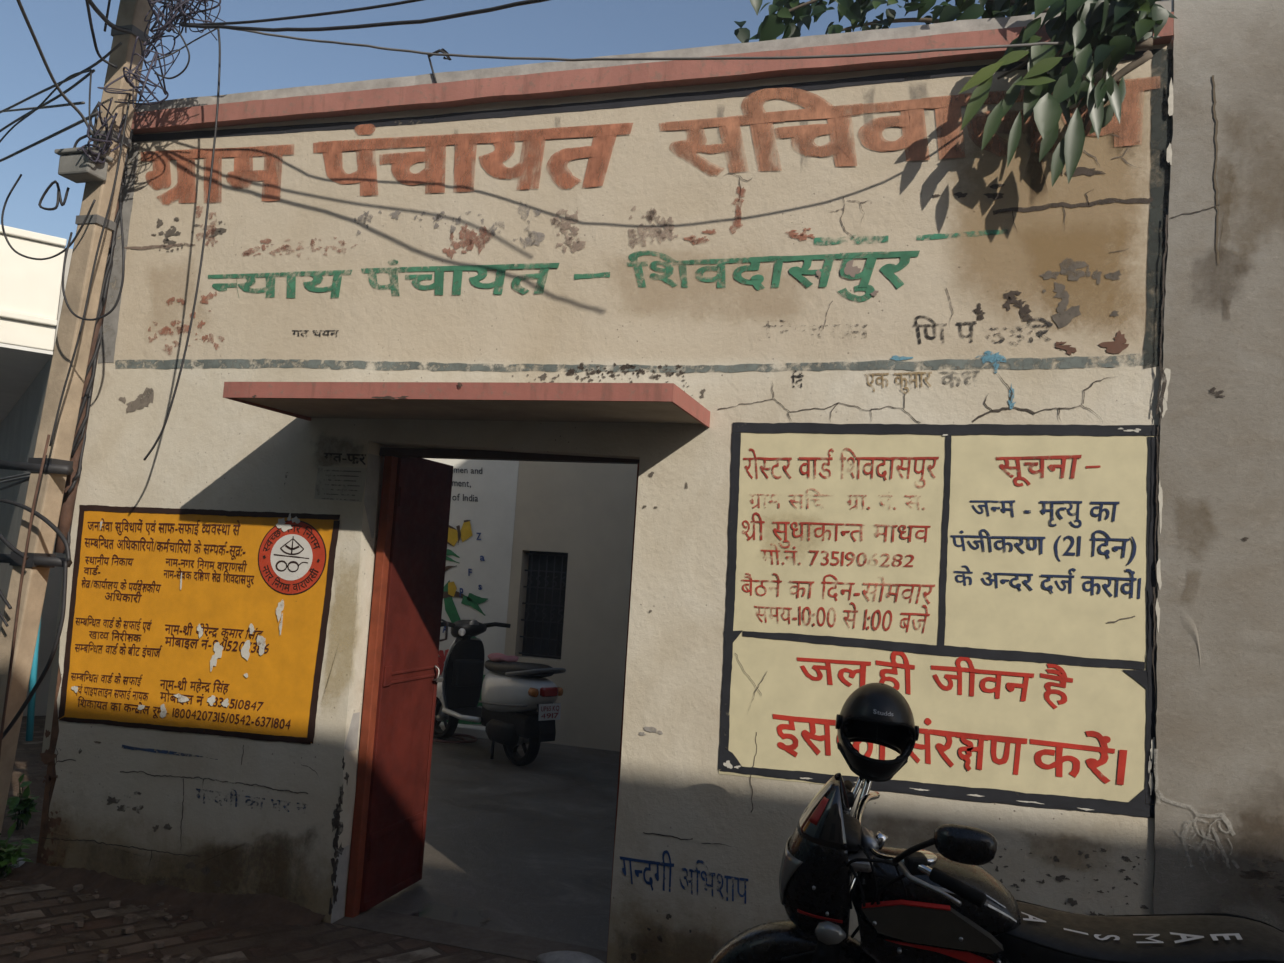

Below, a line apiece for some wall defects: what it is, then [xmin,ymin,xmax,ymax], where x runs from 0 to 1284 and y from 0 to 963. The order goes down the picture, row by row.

peeling [124,206,227,252]
peeling [243,210,502,259]
peeling [513,200,586,253]
peeling [628,186,746,247]
peeling [1003,290,1035,321]
peeling [1039,258,1122,355]
peeling [1098,310,1129,354]
crack [718,383,921,423]
crack [972,372,1110,422]
crack [993,75,1221,695]
peeling [197,624,223,672]
peeling [241,599,284,678]